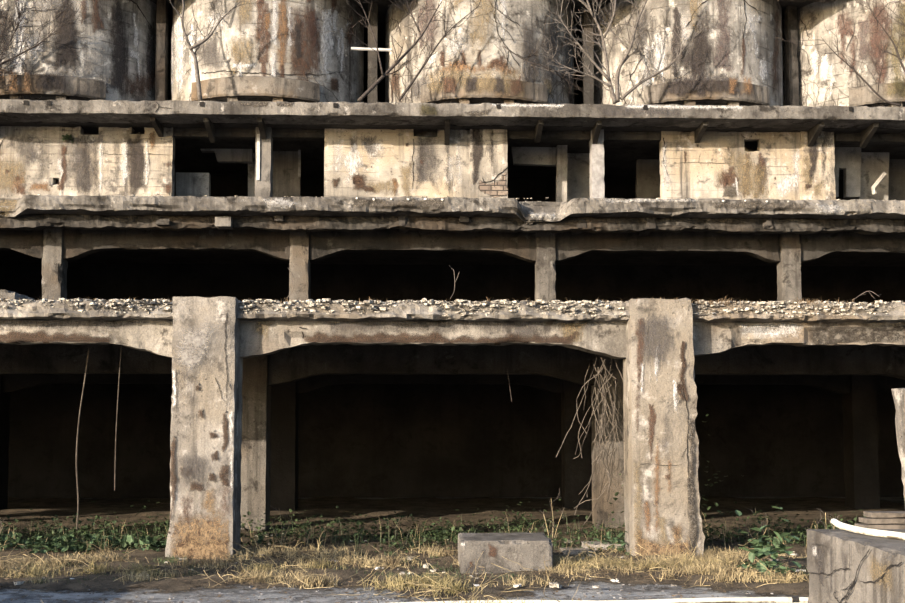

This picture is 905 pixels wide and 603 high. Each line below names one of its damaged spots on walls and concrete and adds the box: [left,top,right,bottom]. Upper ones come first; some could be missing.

corrosion [255,0,320,80]
damp [597,0,742,117]
damp [812,50,833,95]
damp [68,134,103,192]
damp [113,131,149,195]
damp [368,132,460,196]
damp [471,129,493,184]
spalling [478,172,508,197]
corrosion [719,167,749,197]
corrosion [635,319,693,556]
corrosion [172,482,231,560]
crack [805,539,902,603]